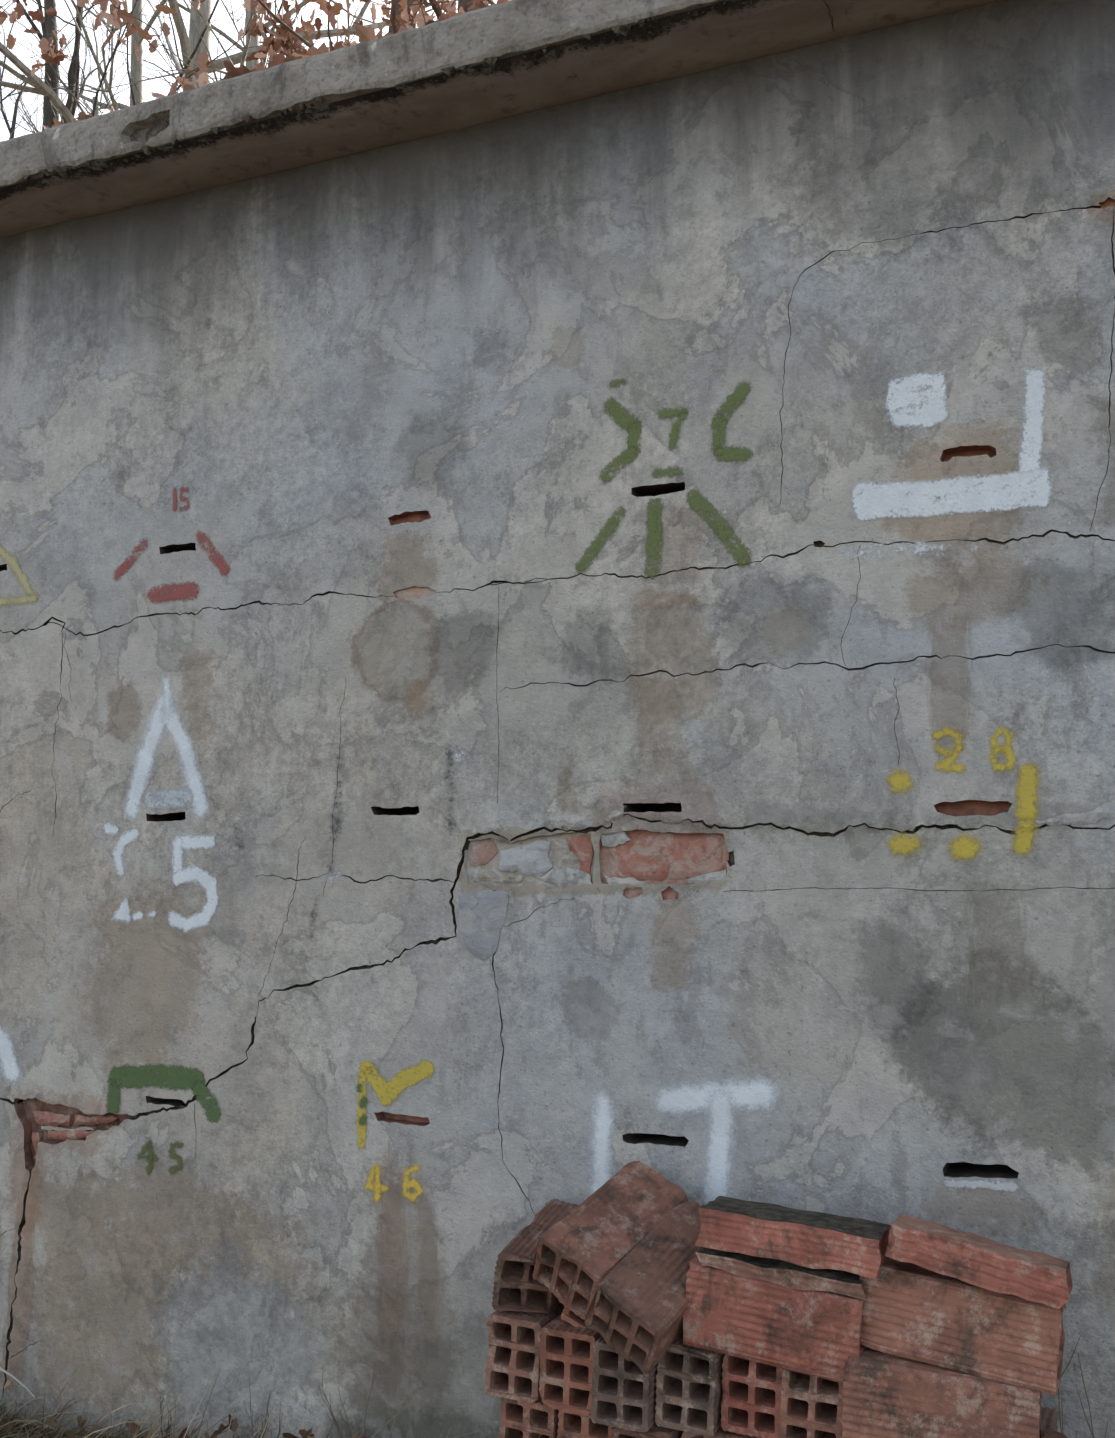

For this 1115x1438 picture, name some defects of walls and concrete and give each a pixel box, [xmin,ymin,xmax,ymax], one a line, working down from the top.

crack [0,591,396,837]
crack [128,206,1115,1155]
spalling [458,829,735,960]
crack [0,1097,18,1105]
spalling [14,1098,130,1171]
crack [492,898,575,1214]
crack [0,1169,42,1399]